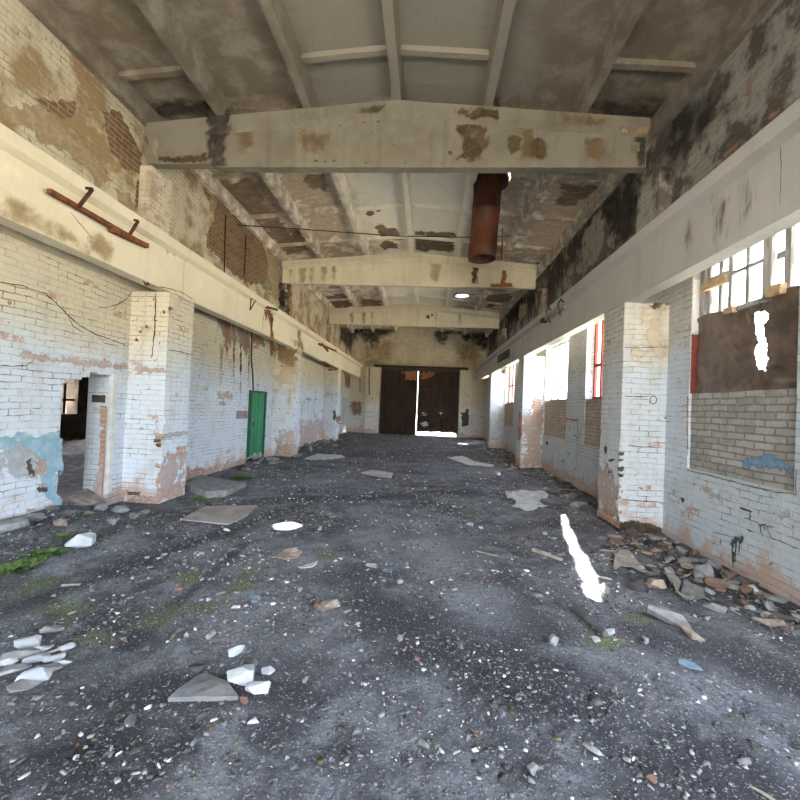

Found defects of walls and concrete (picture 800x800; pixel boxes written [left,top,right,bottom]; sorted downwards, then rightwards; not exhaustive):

peeling [1,98,142,210]
damp [456,107,499,162]
damp [507,129,547,159]
flaking render [202,186,283,300]
crack [1,282,128,347]
crack [151,286,195,358]
rust [264,310,299,368]
damp [340,327,352,349]
peeling [0,431,64,506]
peeling [121,431,250,504]
flaking render [597,445,679,567]